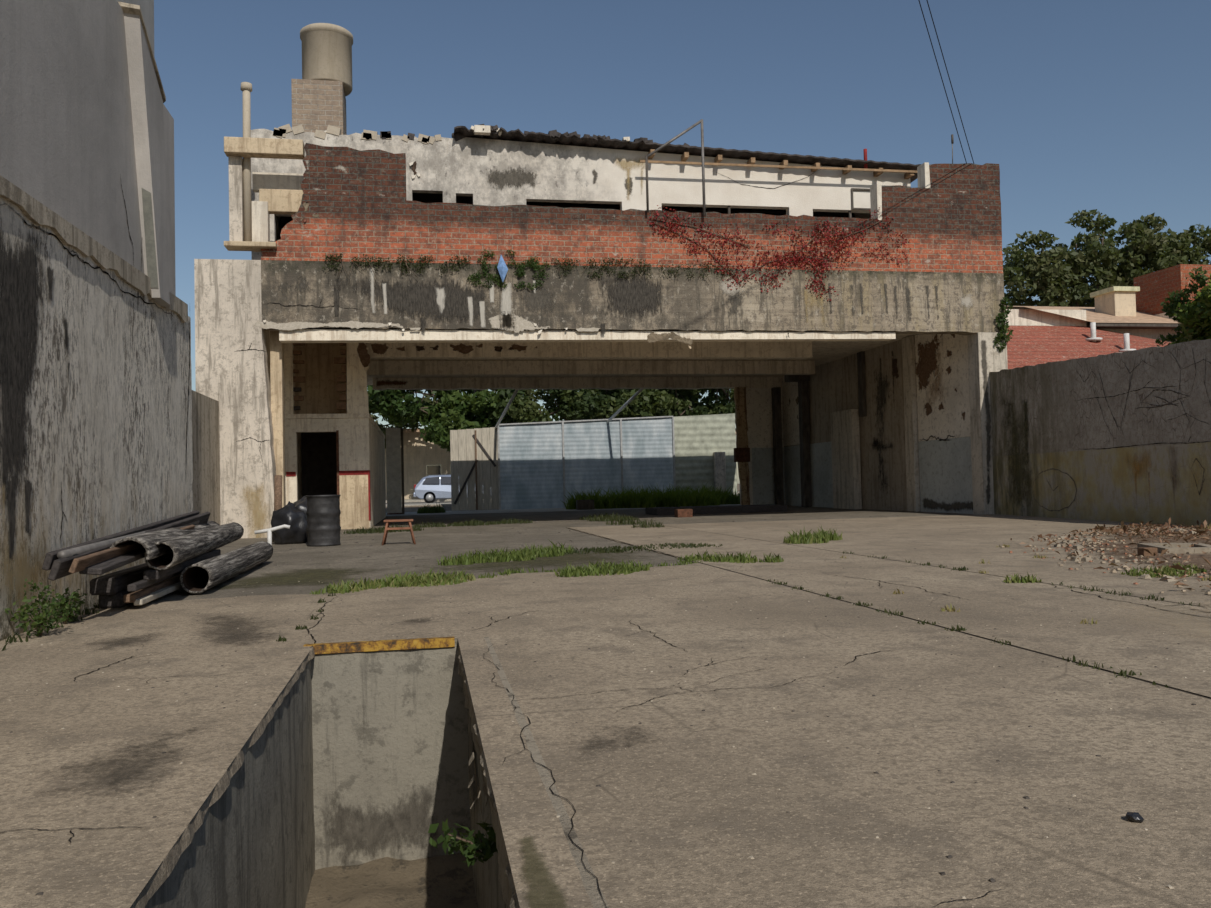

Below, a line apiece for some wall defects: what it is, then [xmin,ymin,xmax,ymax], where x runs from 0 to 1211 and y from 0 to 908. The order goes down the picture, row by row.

leakage [0,231,54,602]
crack [4,176,190,484]
leakage [600,272,662,334]
peeling [914,334,955,416]
leakage [923,340,1030,511]
crack [307,597,336,648]
crack [462,609,880,908]